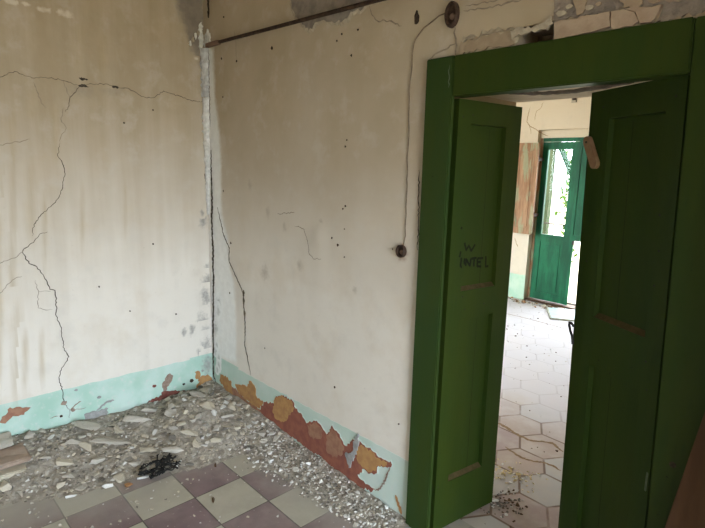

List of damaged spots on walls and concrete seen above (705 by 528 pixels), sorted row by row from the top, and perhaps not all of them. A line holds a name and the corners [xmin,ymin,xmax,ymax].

flaking render [290,0,387,33]
flaking render [459,0,705,55]
crack [0,52,210,418]
crack [204,154,251,382]
peeling [0,407,31,424]
peeling [148,370,402,528]